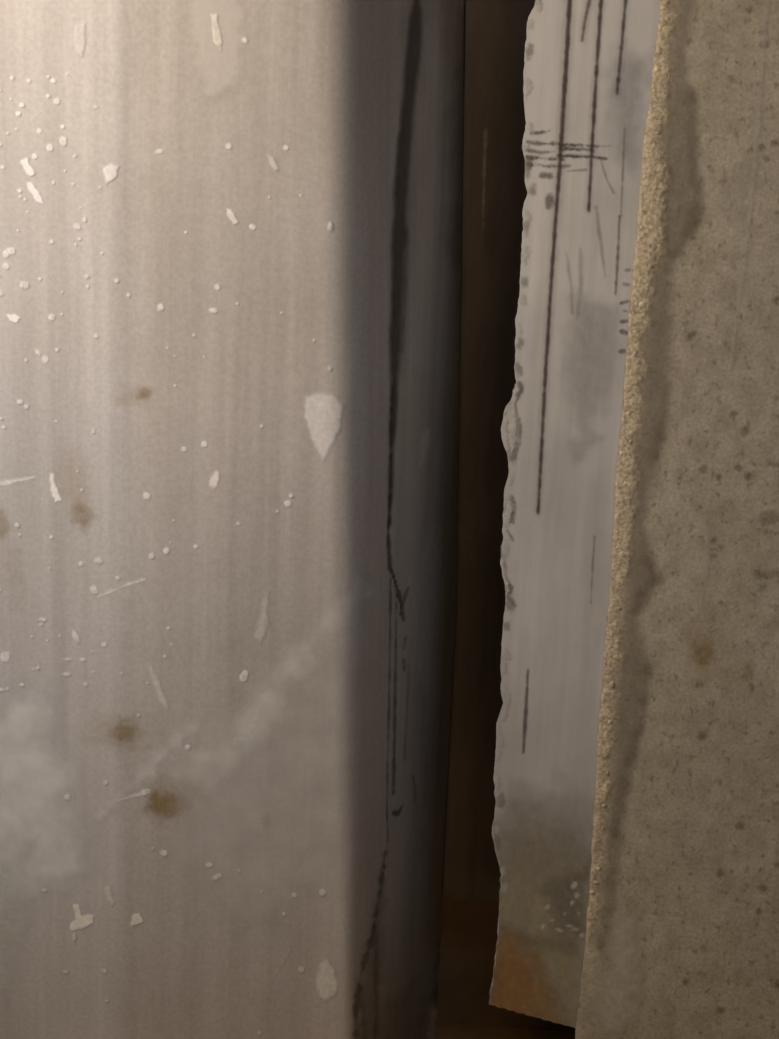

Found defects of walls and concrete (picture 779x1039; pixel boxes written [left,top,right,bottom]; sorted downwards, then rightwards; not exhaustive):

peeling [305,393,343,460]
leakage [0,693,83,905]
peeling [70,904,93,931]
peeling [316,959,338,1001]